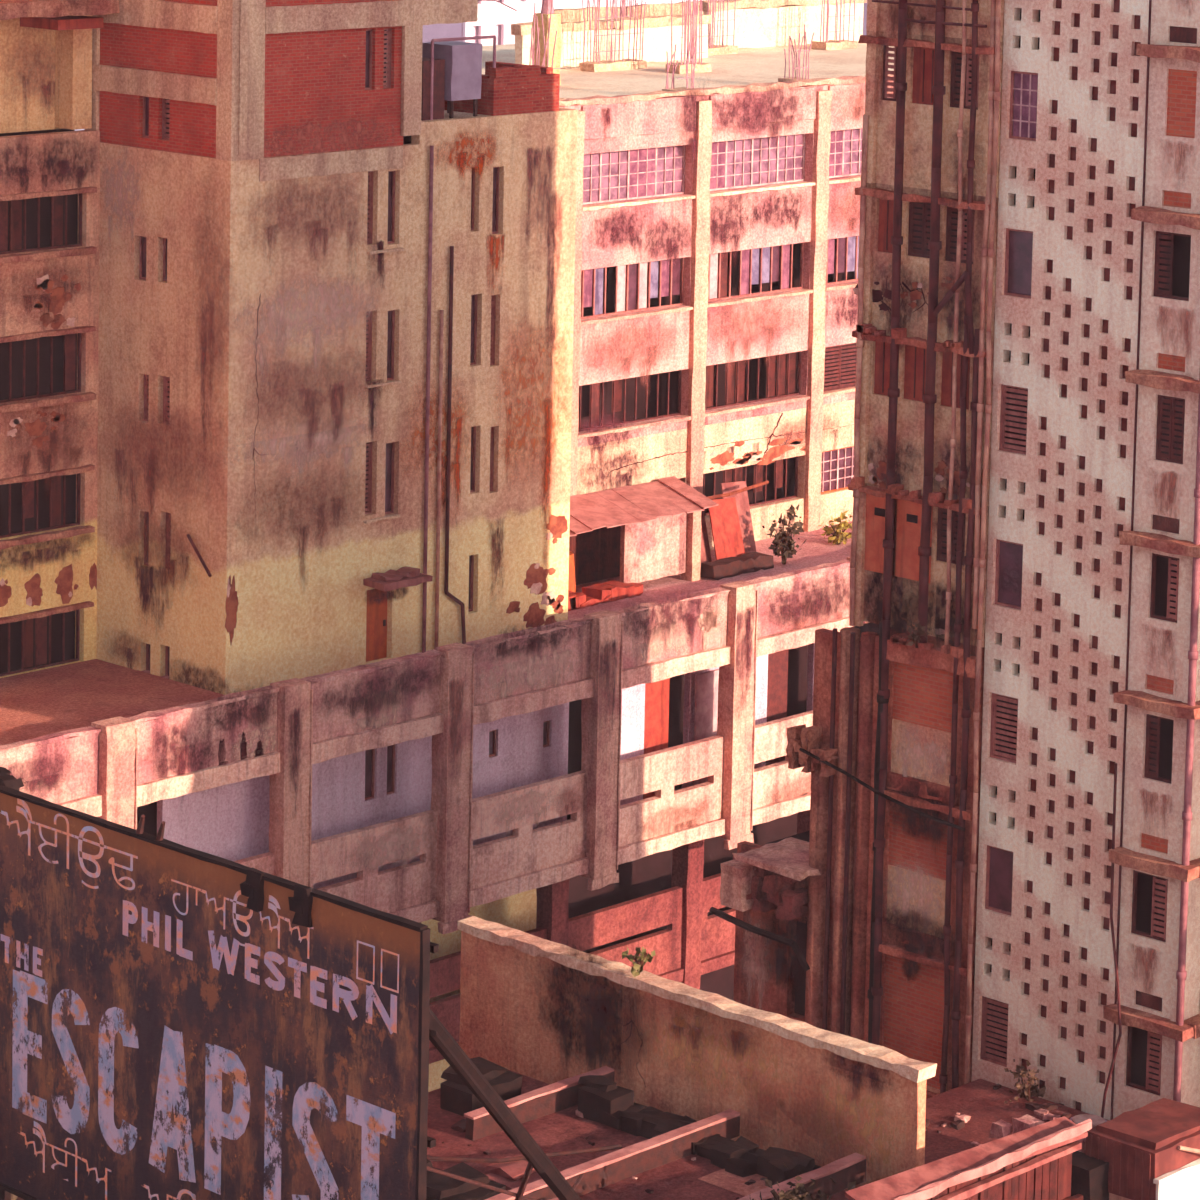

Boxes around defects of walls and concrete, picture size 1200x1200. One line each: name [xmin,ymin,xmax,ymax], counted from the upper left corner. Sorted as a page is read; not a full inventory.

rust [437,134,494,176]
leakage [267,187,353,252]
leakage [595,214,692,261]
peeling [33,274,81,329]
rust [502,328,565,524]
peeling [709,438,806,470]
spalling [546,515,568,544]
spalling [0,563,97,607]
leakage [127,526,188,615]
peeling [506,563,564,628]
spalling [746,866,808,921]
leakage [540,943,896,1164]